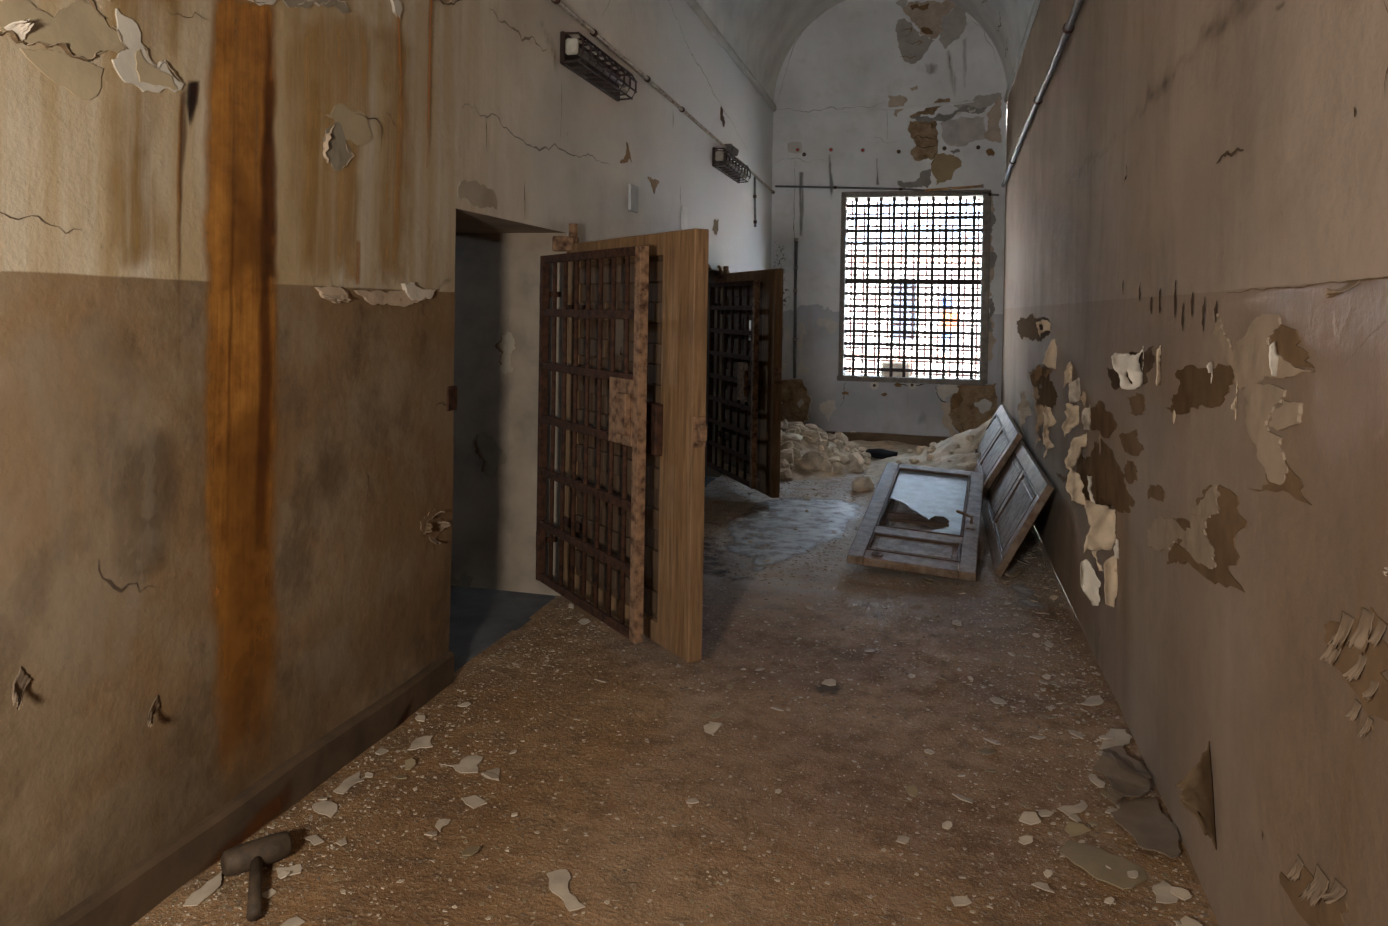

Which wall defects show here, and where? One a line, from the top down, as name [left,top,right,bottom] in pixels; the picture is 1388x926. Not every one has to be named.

peeling [0,0,184,100]
peeling [247,0,350,13]
flaking render [895,0,967,64]
flaking render [323,103,372,171]
crack [462,88,609,165]
peeling [888,85,1002,188]
crack [0,212,80,234]
flaking render [984,189,997,361]
rust [177,0,276,724]
flaking render [935,383,998,437]
peeling [1017,276,1388,607]
peeling [1319,607,1388,738]